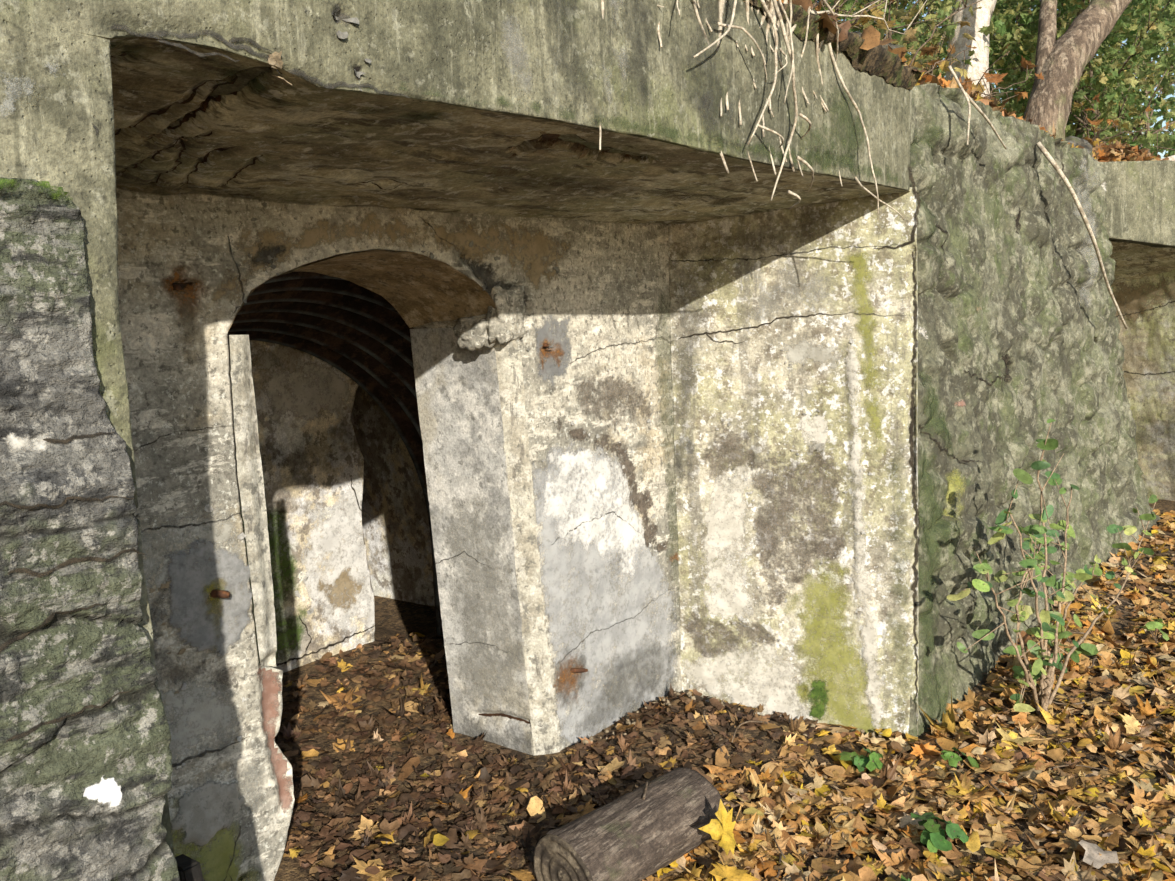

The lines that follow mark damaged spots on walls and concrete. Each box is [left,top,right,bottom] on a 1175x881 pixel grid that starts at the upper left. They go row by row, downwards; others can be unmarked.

crack [92,24,422,185]
rust [164,267,204,316]
rust [540,339,564,366]
crack [552,165,981,722]
crack [964,370,1005,386]
peeling [141,505,247,766]
spalling [258,668,293,812]
rust [555,660,588,691]